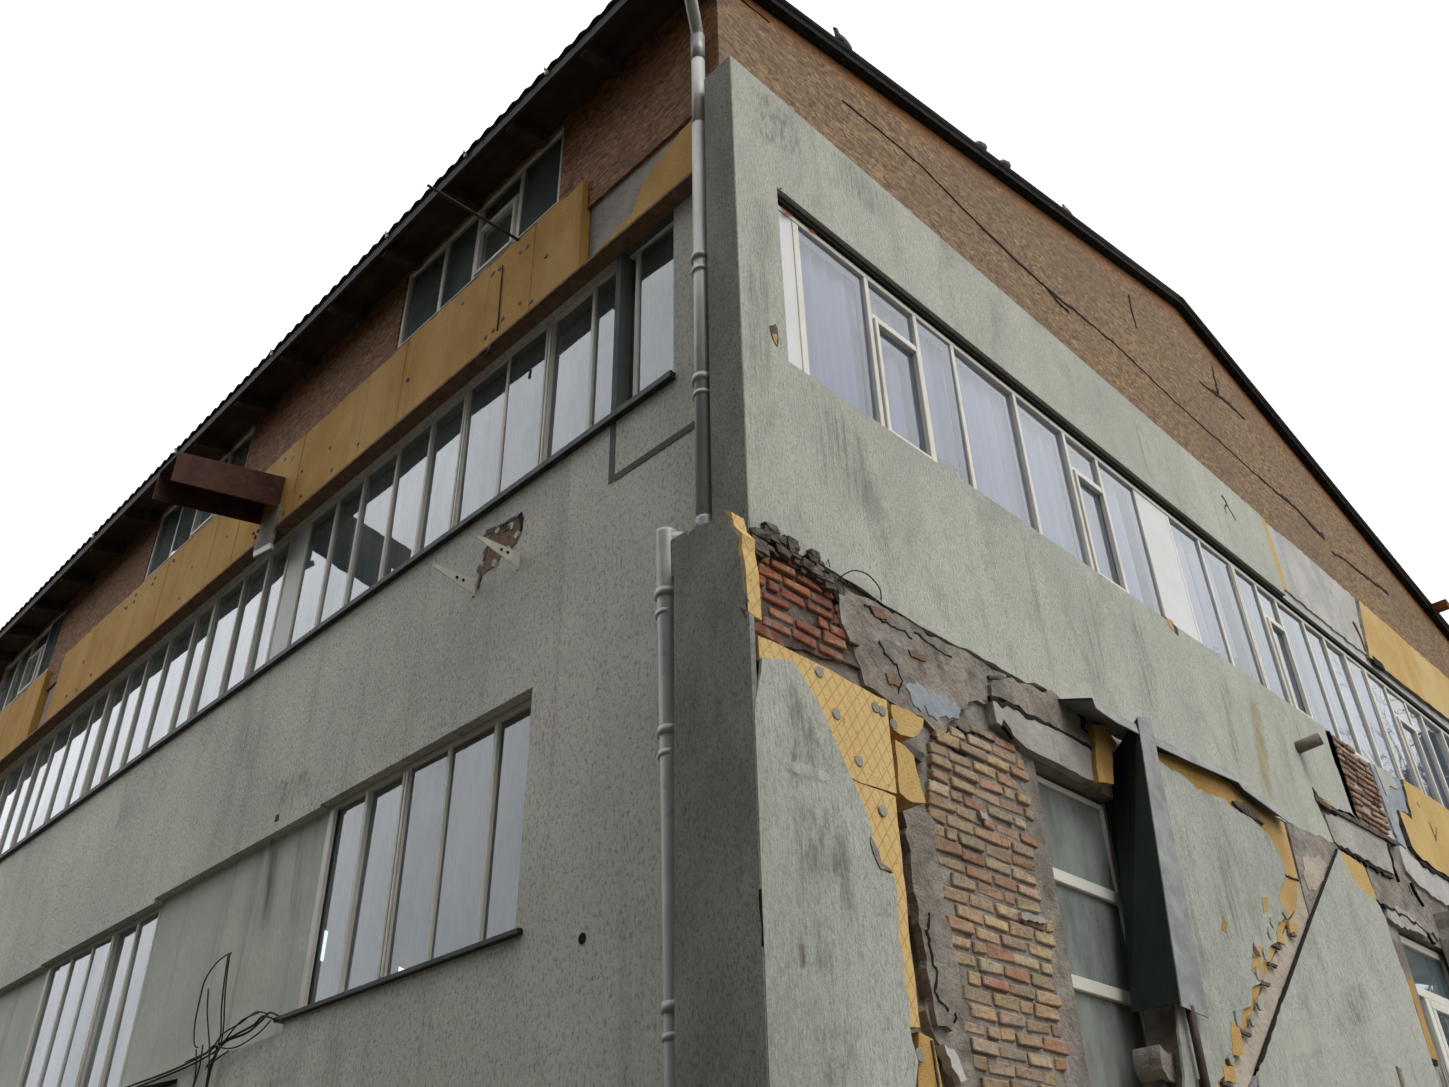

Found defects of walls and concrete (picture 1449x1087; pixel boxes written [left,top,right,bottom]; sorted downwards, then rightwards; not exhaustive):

crack [842,100,1389,595]
flaking render [749,521,1104,1087]
spalling [1283,735,1449,945]
peeling [1220,1053,1235,1087]
peeling [1233,909,1297,1038]